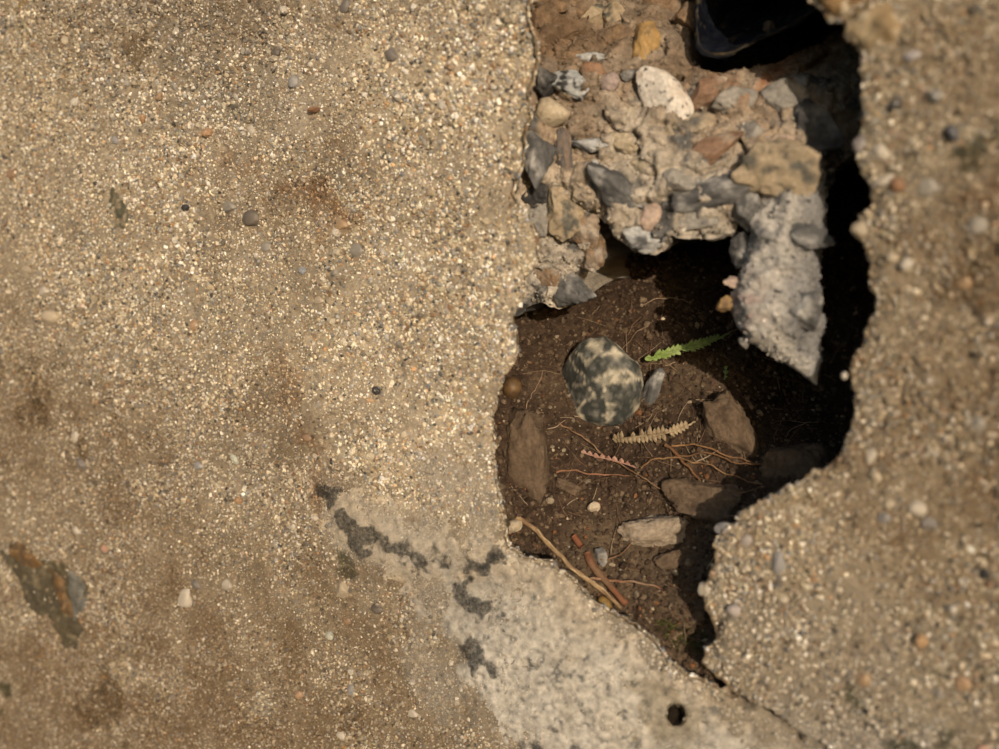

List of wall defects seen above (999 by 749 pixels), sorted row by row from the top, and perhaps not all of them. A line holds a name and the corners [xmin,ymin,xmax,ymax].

spalling [488,0,903,699]
crack [740,695,782,719]